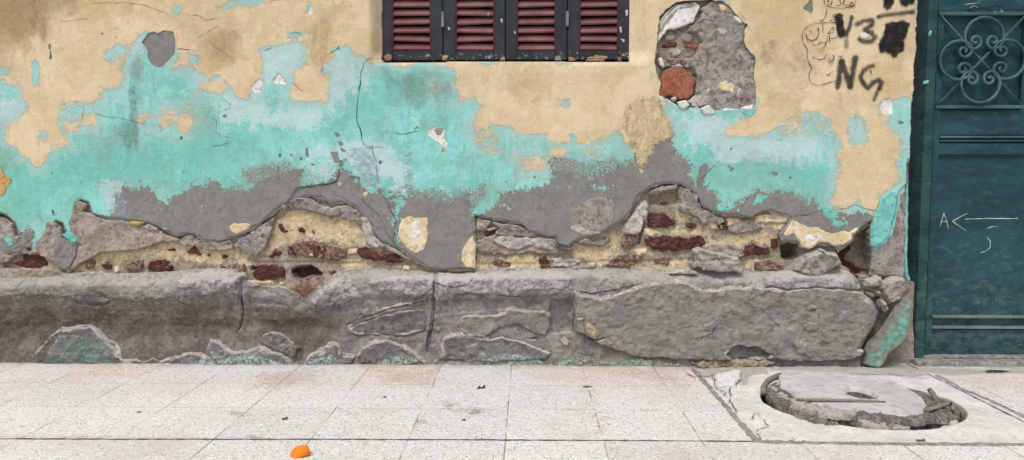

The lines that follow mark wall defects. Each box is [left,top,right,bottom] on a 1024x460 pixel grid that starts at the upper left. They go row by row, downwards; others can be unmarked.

flaking render [141,31,175,68]
flaking render [656,1,756,118]
crack [301,58,419,245]
flaking render [0,132,909,306]
crack [234,287,244,347]
crack [332,278,522,345]
crack [572,285,637,338]